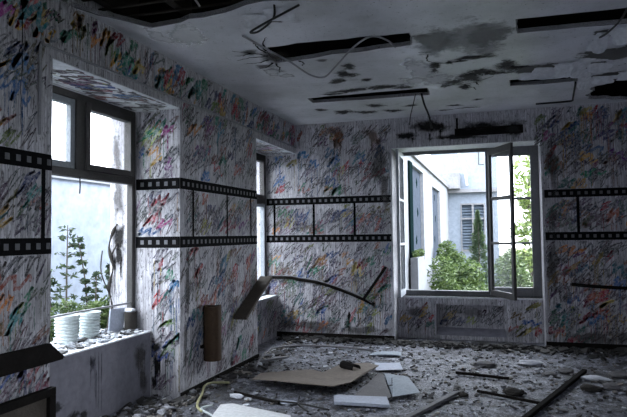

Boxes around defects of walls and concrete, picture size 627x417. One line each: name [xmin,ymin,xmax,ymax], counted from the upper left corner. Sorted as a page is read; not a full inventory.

damp [323,59,528,95]
peeling [501,26,627,90]